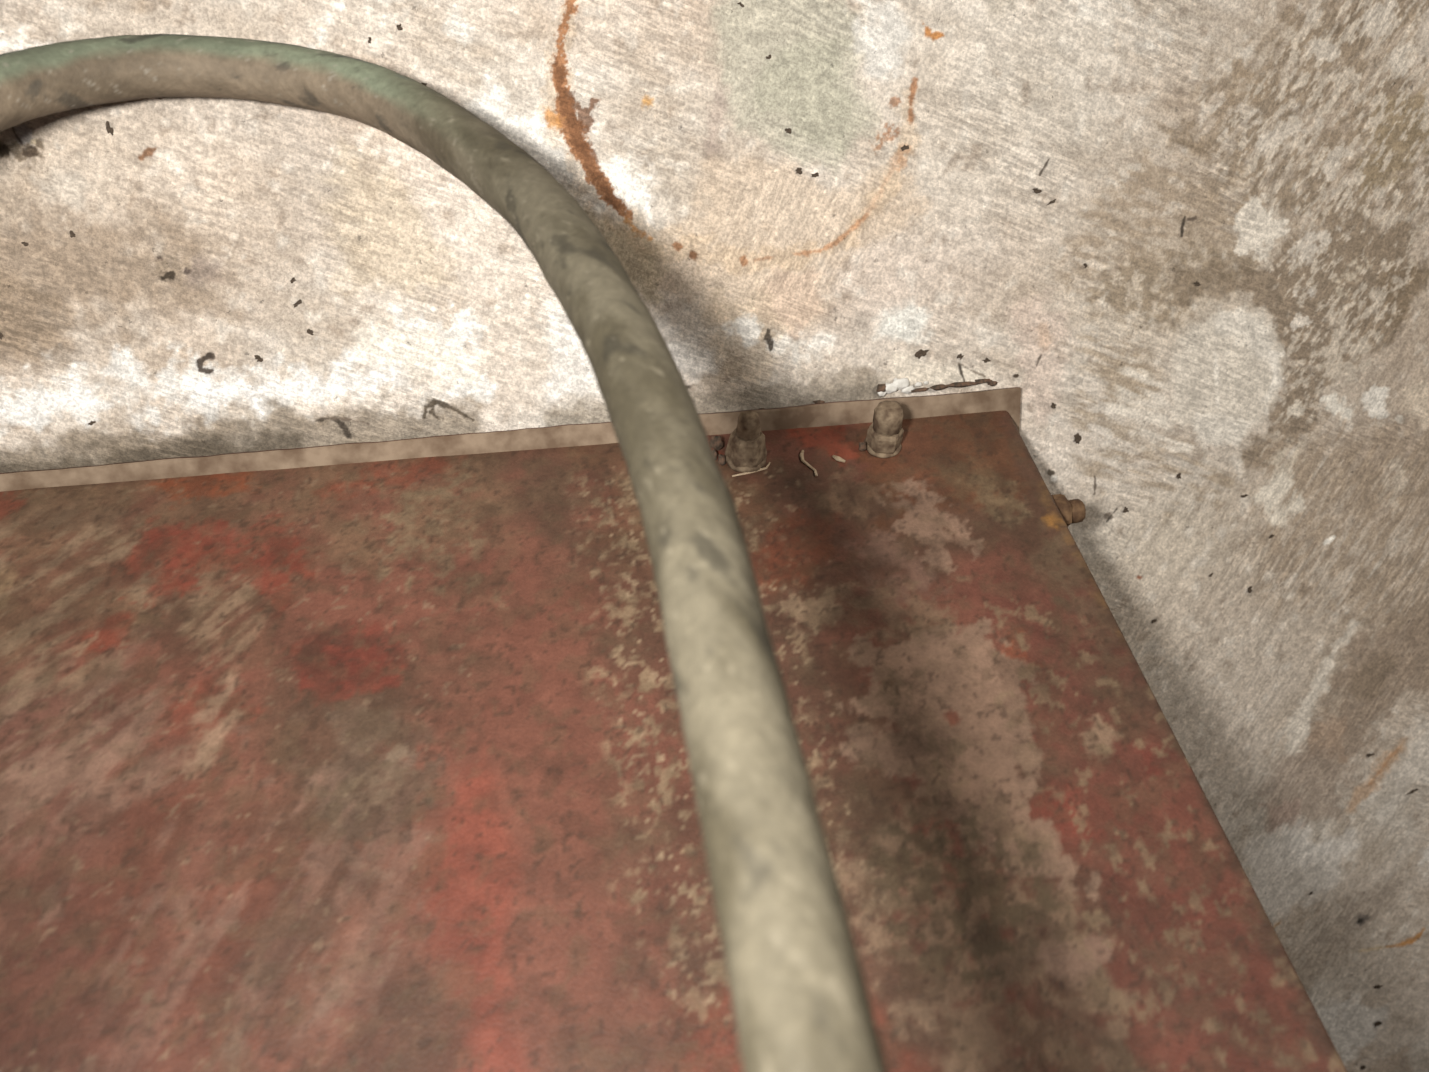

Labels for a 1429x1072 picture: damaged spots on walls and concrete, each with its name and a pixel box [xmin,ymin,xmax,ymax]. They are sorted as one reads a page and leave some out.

rust [536,0,925,280]
leakage [999,238,1264,428]